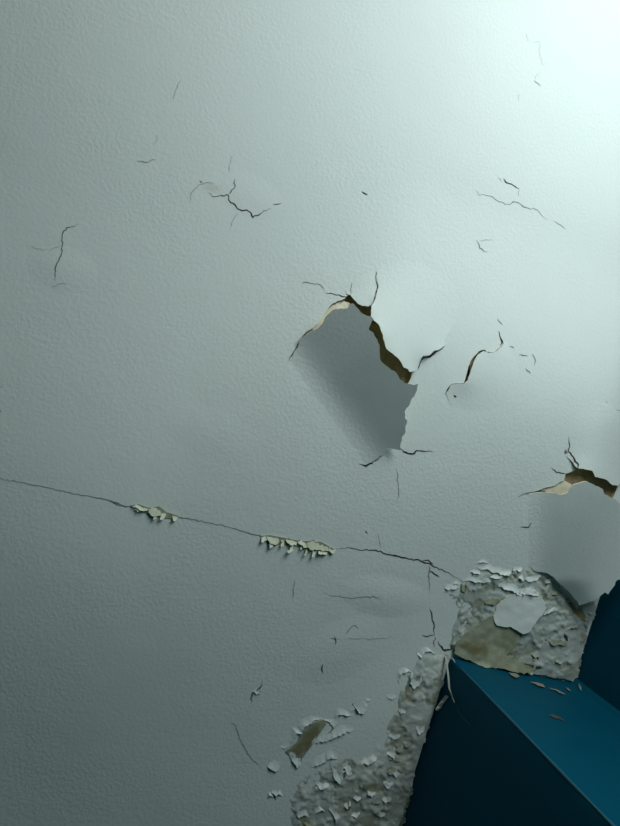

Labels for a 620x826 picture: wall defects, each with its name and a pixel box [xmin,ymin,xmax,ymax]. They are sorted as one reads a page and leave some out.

crack [190,154,281,226]
crack [478,179,564,228]
crack [31,224,77,287]
crack [445,318,536,412]
crack [1,478,134,508]
peeling [130,504,178,521]
crack [178,517,261,536]
peeling [261,535,336,558]
flaking render [267,559,597,826]